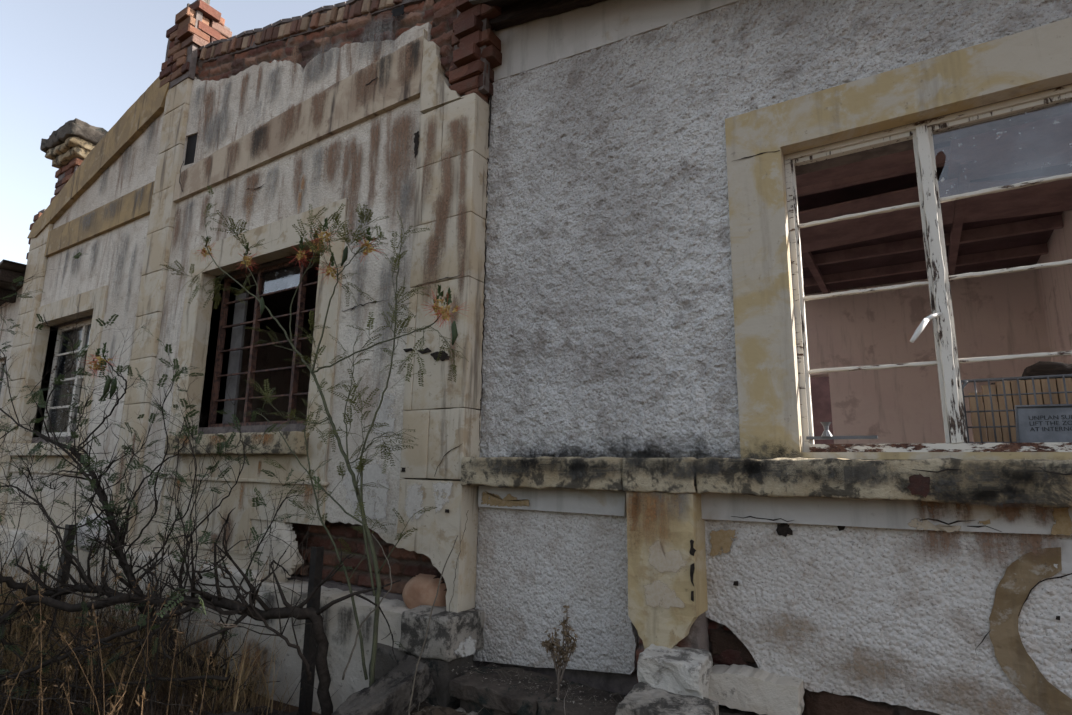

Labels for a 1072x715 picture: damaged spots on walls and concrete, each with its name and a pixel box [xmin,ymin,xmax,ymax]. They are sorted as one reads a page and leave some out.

leakage [355,21,419,100]
leakage [196,67,278,176]
leakage [252,90,326,154]
leakage [315,114,415,307]
leakage [423,122,467,245]
peeling [372,395,395,444]
leakage [472,442,896,485]
crack [912,466,961,474]
spalling [291,460,452,594]
peeling [710,529,737,556]
leakage [919,460,1072,564]
crack [1018,573,1072,616]